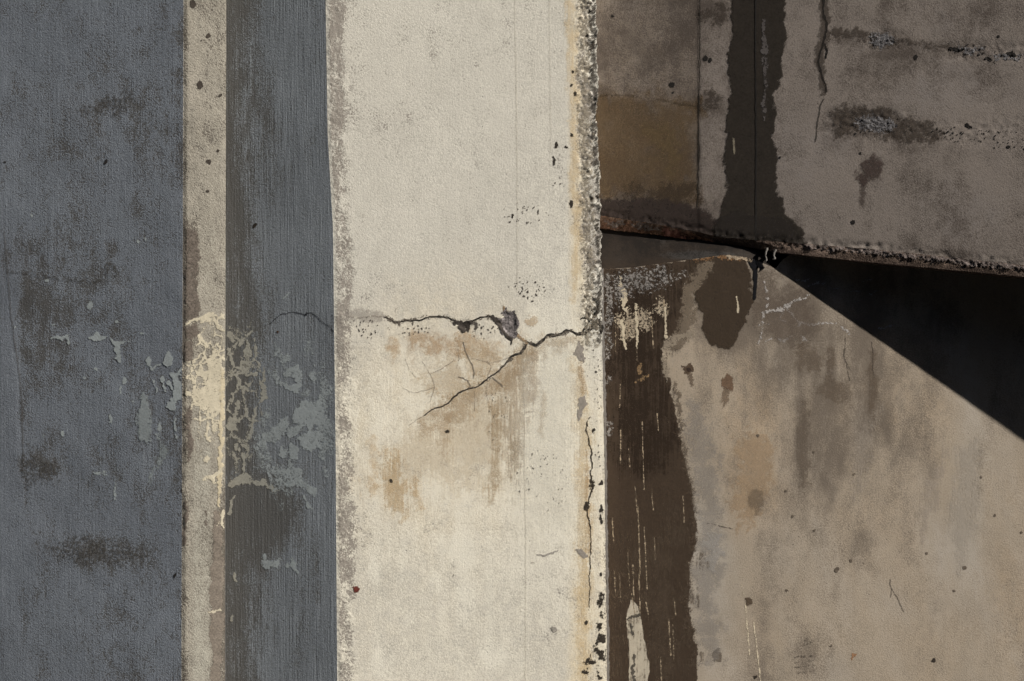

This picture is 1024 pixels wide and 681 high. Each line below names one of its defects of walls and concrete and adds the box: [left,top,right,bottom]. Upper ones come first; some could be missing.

crack [815,0,832,142]
crack [270,312,334,333]
crack [384,305,604,416]
corrosion [694,255,753,263]
leakage [575,0,877,681]
crack [584,417,595,607]